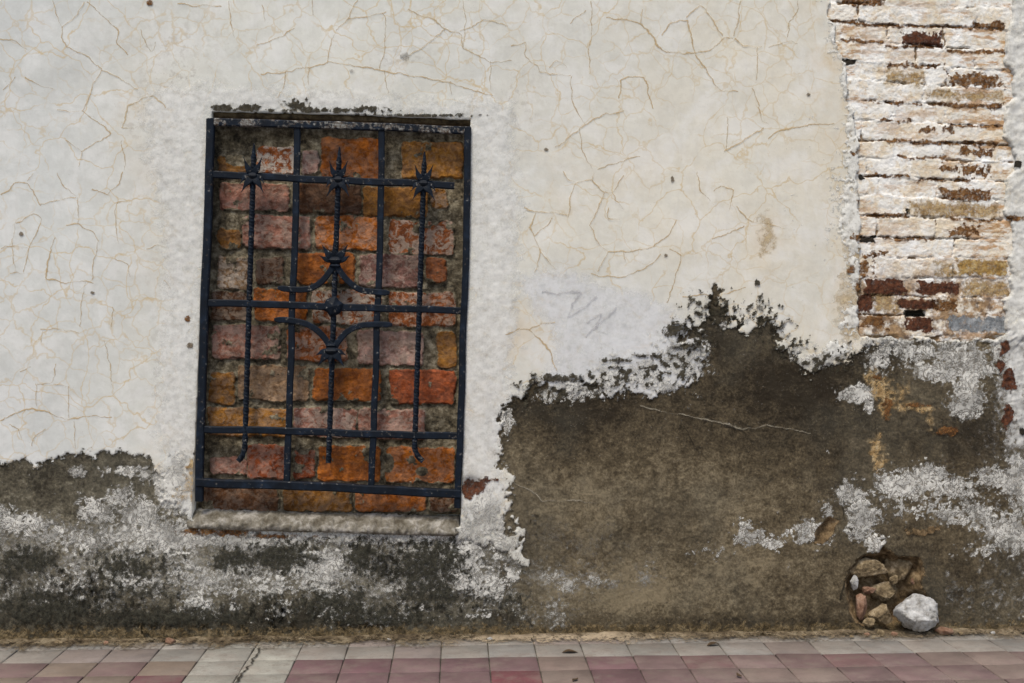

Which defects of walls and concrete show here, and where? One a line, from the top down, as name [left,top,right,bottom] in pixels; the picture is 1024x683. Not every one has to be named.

crack [1,0,166,333]
crack [261,0,834,301]
crack [0,365,111,442]
peeling [0,445,615,632]
leakage [0,283,1024,644]
crack [505,322,557,370]
peeling [499,279,769,436]
crack [640,405,811,451]
flaking render [686,0,1024,630]